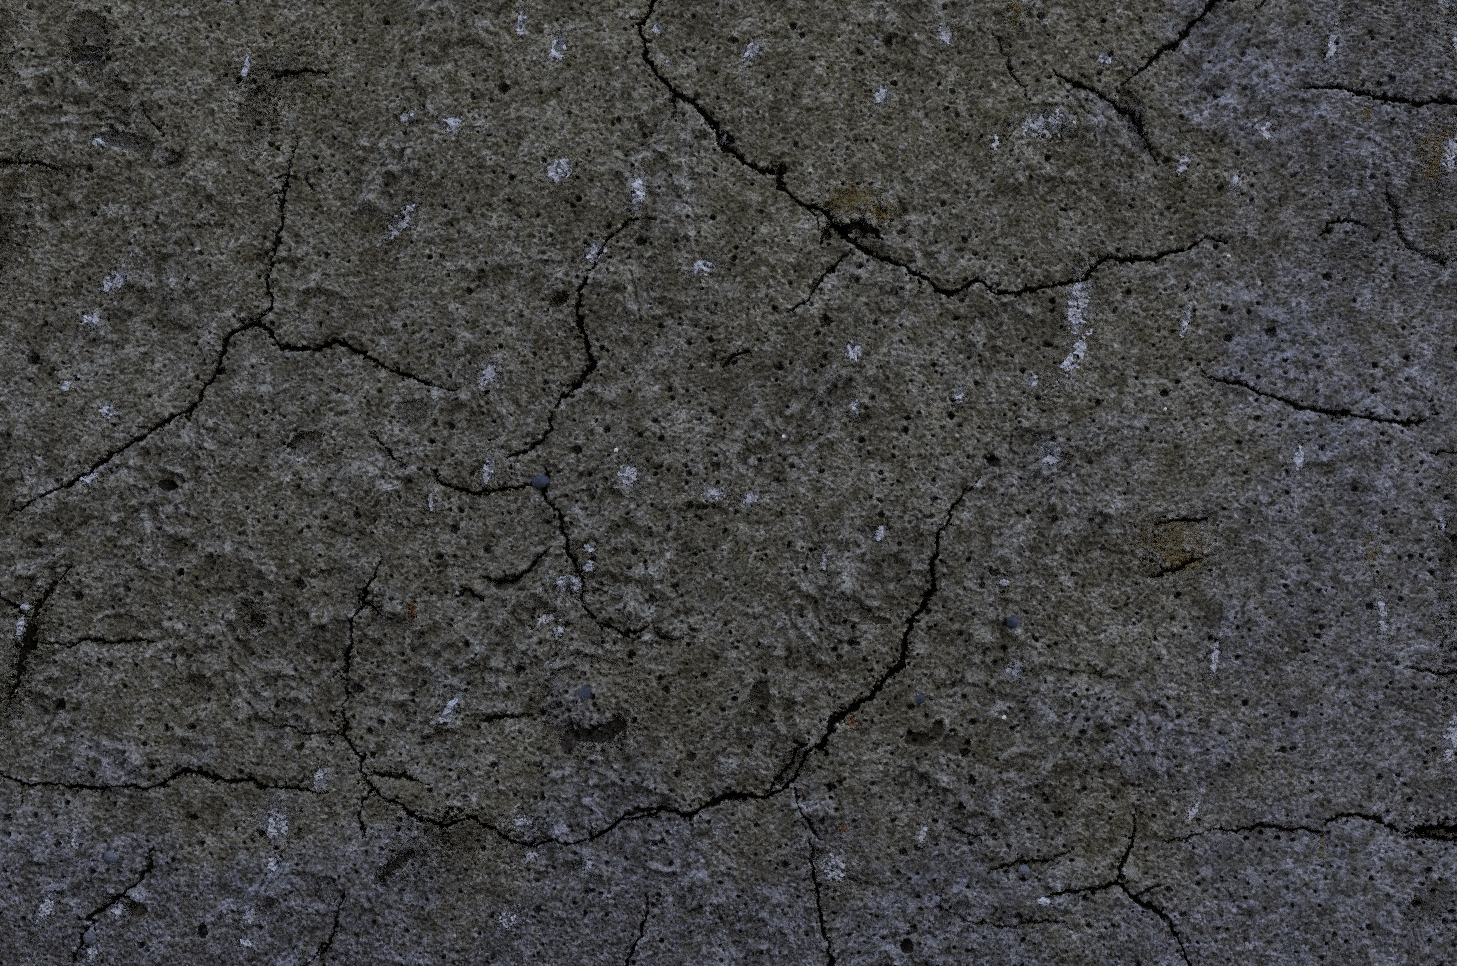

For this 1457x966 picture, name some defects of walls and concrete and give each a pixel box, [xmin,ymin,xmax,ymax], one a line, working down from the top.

crack [0,143,456,515]
crack [370,216,685,640]
crack [631,0,1266,311]
crack [1201,370,1454,456]
crack [0,480,978,966]
crack [940,811,1457,966]